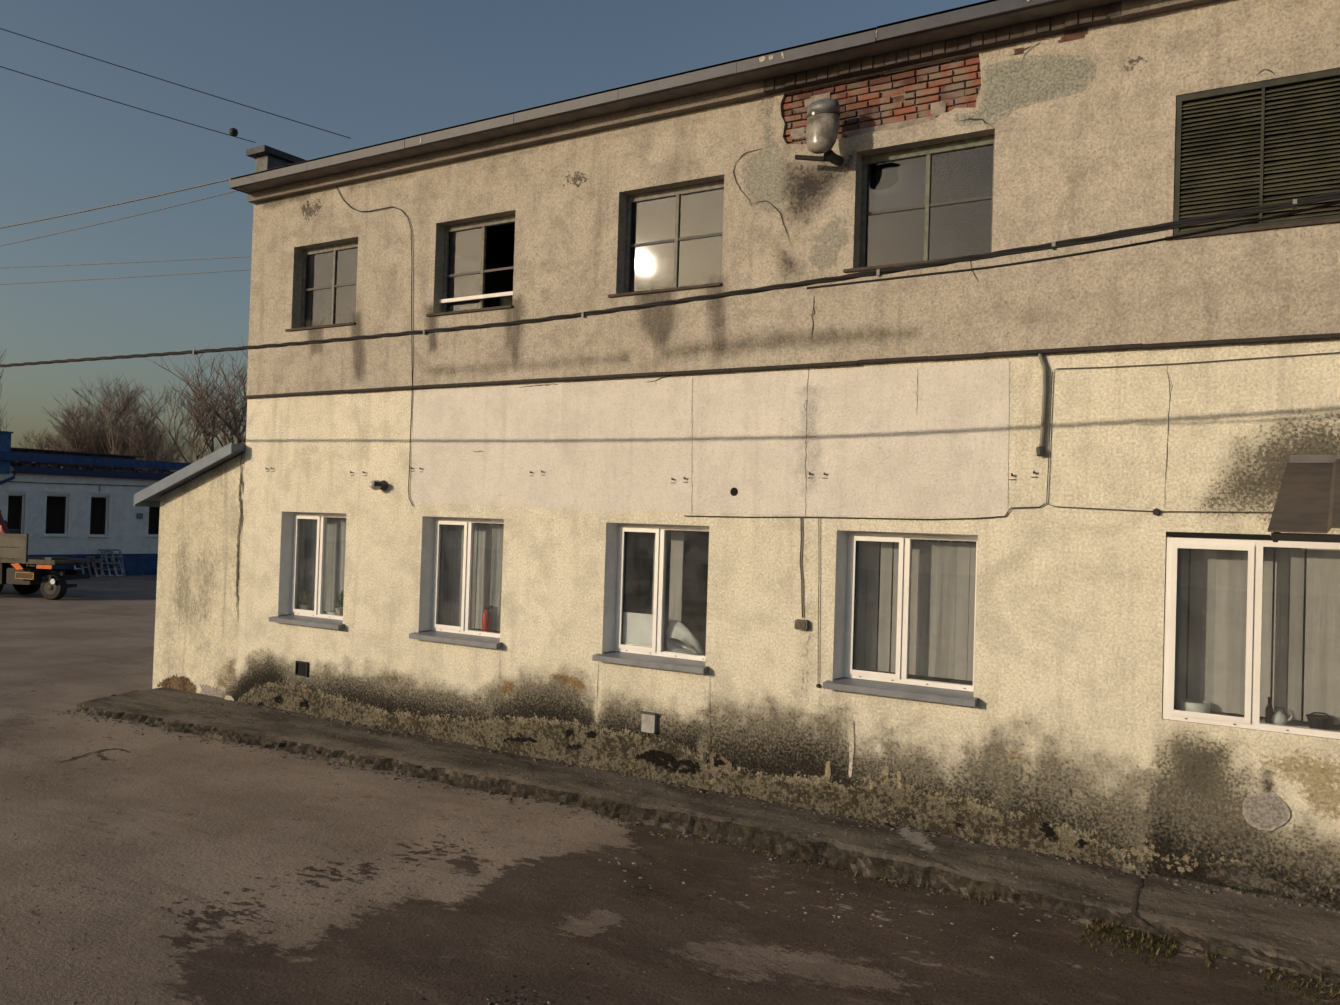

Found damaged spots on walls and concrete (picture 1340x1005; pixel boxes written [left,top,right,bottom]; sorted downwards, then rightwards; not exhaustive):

crack [733,149,790,243]
peeling [811,219,845,267]
spalling [745,28,1096,212]
crack [235,453,243,620]
water stain [1195,414,1340,524]
water stain [217,655,1340,909]